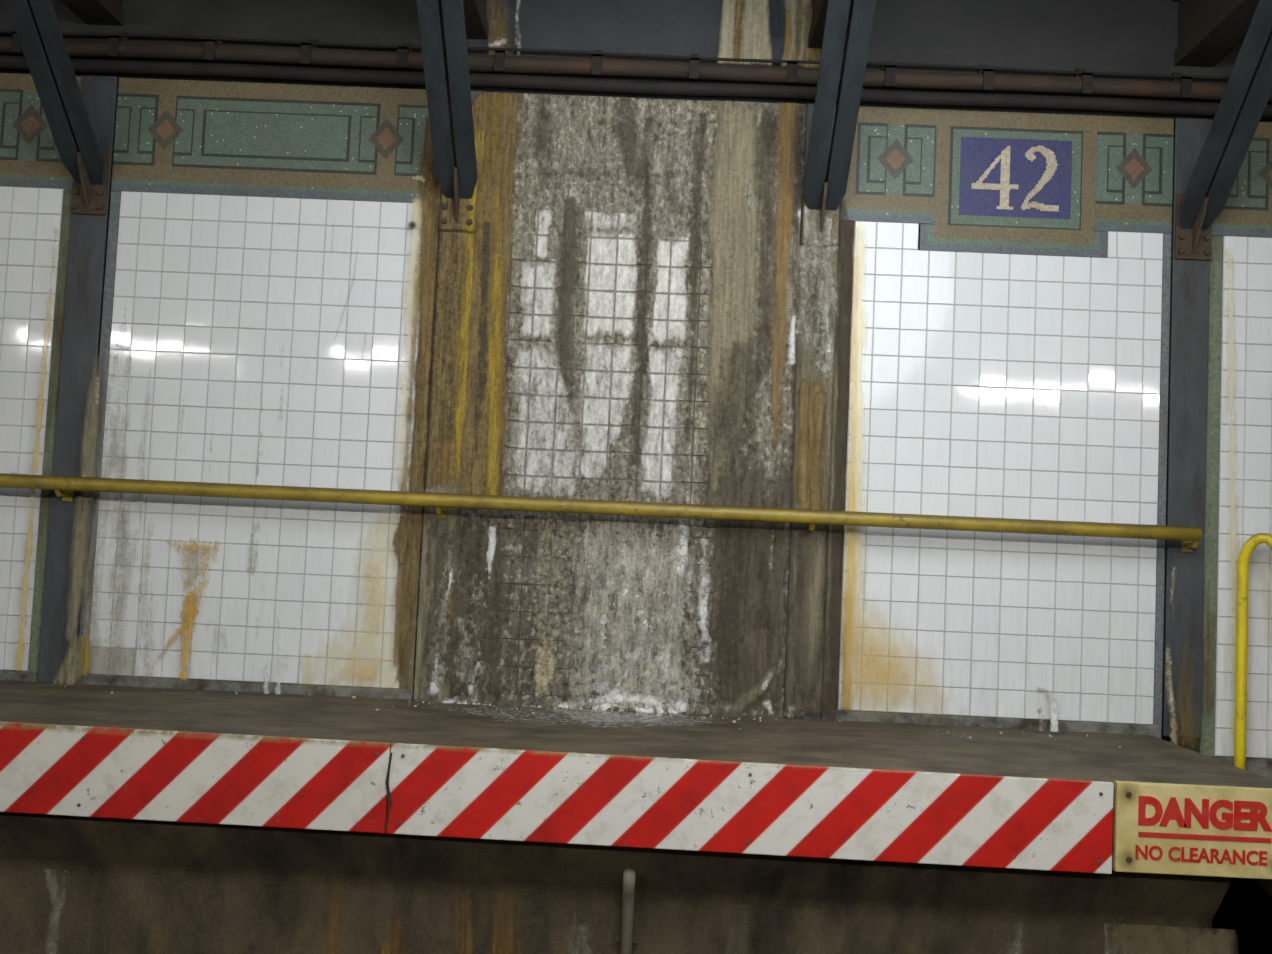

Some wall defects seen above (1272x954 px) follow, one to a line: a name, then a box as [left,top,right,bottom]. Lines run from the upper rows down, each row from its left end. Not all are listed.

peeling [718,0,820,68]
damp [432,97,850,728]
corrosion [166,541,217,680]